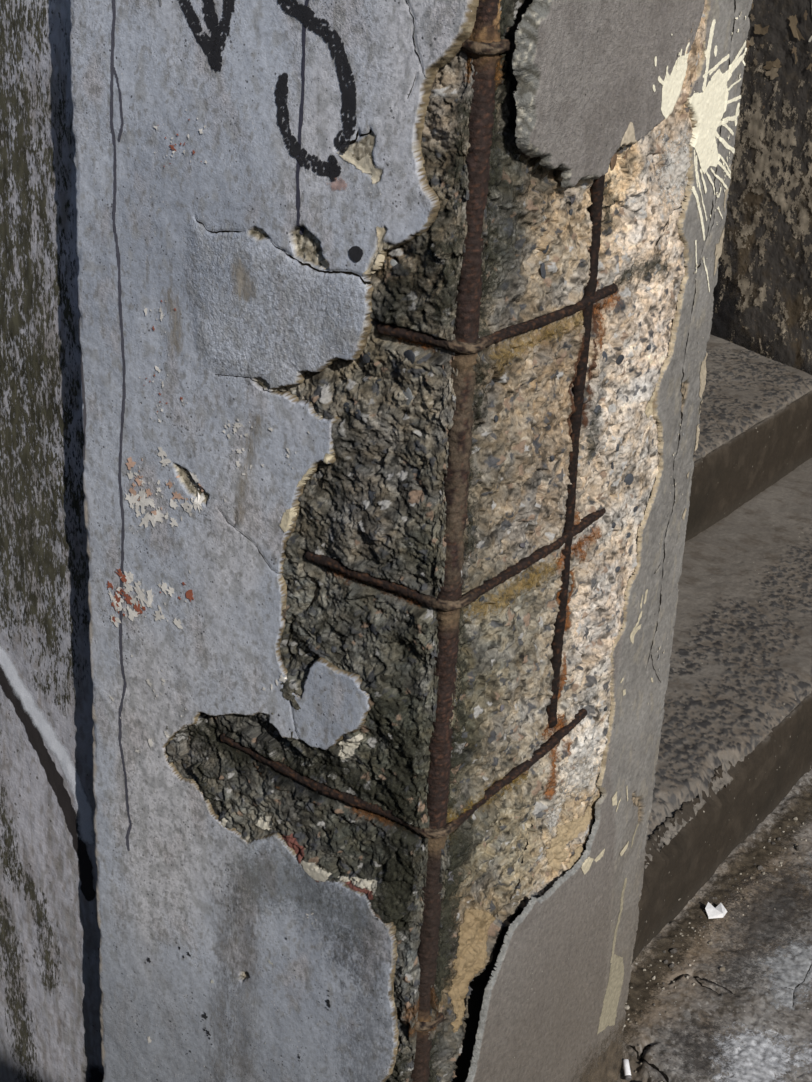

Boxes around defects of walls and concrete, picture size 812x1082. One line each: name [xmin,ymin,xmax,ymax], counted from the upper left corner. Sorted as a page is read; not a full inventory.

crack [195,217,242,233]
crack [270,240,371,284]
peeling [710,0,812,359]
rust [567,292,620,435]
crack [648,169,717,682]
damp [0,327,89,713]
peeling [107,569,194,629]
spalling [125,0,708,1082]
rust [542,716,572,800]
crack [630,1045,669,1082]